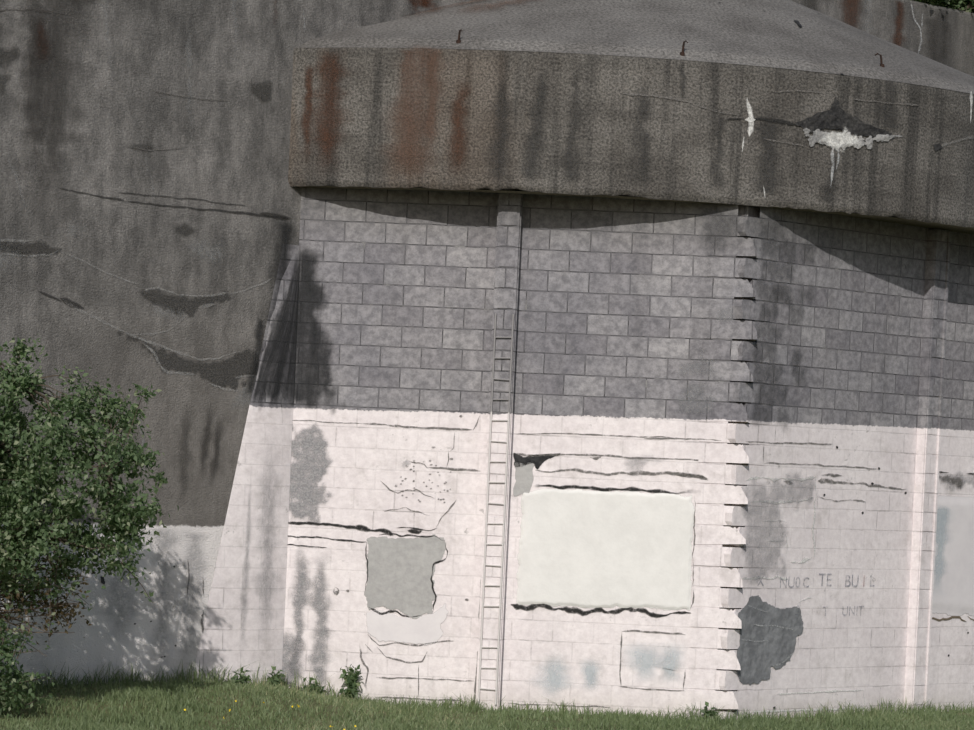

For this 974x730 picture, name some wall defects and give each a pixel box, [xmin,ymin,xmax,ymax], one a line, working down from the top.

corrosion [303,60,339,152]
spalling [794,97,900,182]
crack [62,188,290,220]
spalling [0,239,60,256]
spalling [142,280,269,316]
spalling [85,312,259,398]
spalling [364,460,456,663]
peeling [513,453,560,496]
peeling [746,474,907,563]
peeling [939,471,974,489]
leakage [282,560,328,683]
spalling [737,595,811,685]